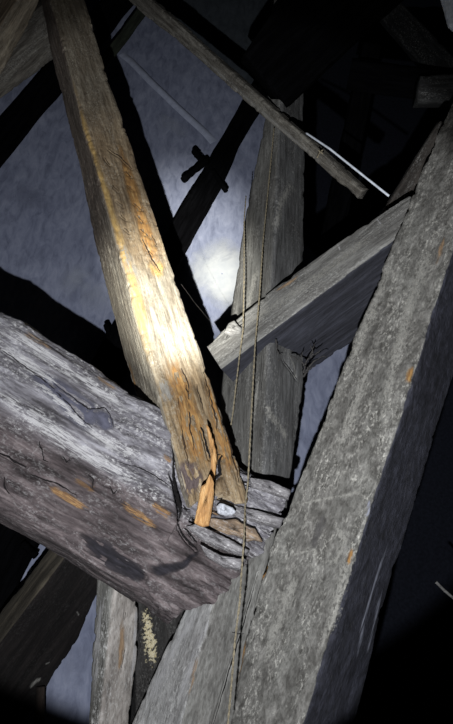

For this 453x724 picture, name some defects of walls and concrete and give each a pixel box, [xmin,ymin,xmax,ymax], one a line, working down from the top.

crack [0,441,77,496]
crack [120,369,250,551]